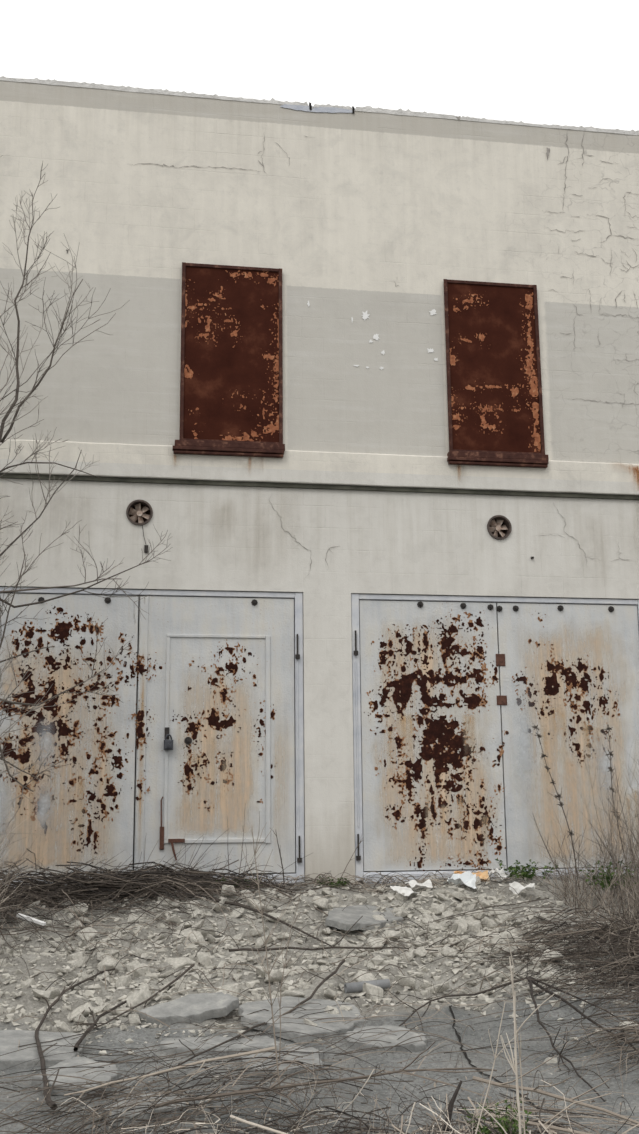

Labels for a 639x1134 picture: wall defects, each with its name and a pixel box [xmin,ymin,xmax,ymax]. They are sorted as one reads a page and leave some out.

crack [542,136,639,407]
crack [269,491,339,576]
corrosion [0,603,166,869]
corrosion [172,639,277,833]
corrosion [364,609,636,871]